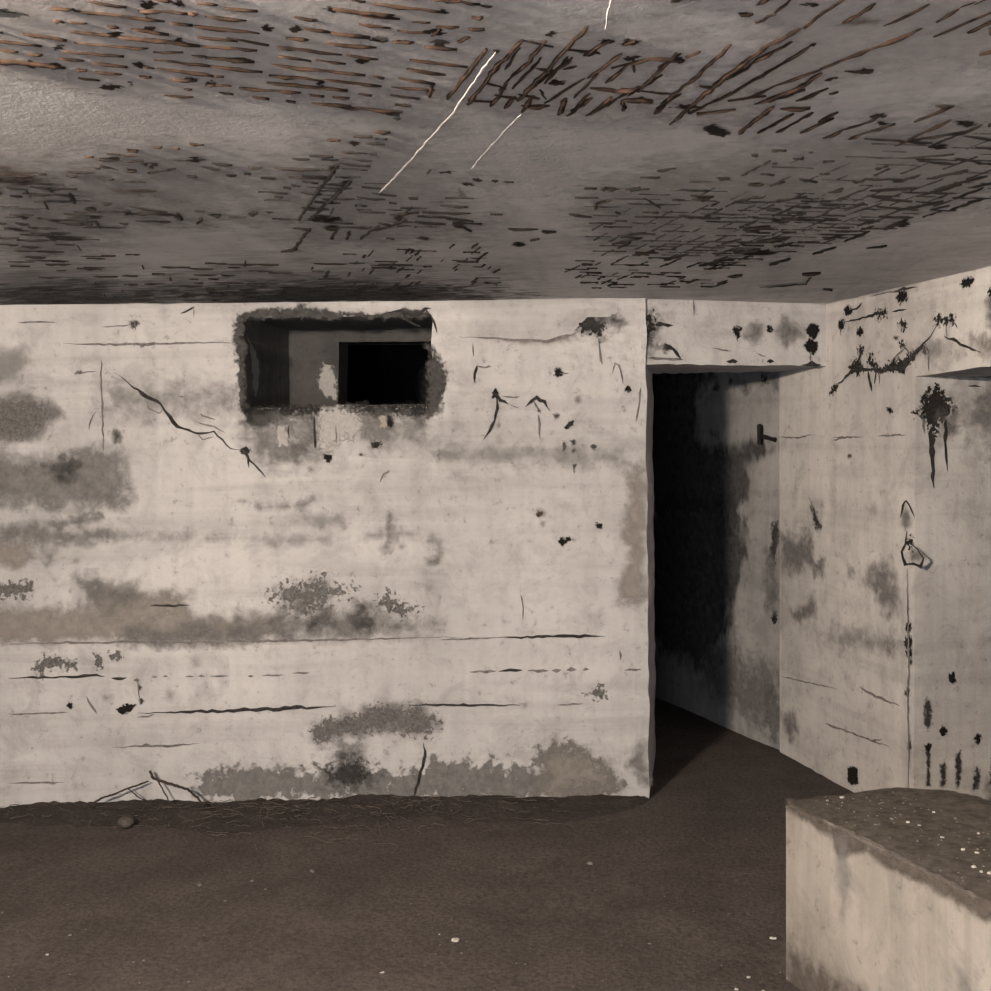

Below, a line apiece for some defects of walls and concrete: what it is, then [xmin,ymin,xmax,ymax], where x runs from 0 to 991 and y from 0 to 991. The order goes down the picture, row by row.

spalling [0,0,991,302]
crack [844,289,906,323]
crack [803,312,979,395]
crack [18,321,266,478]
spalling [276,363,363,453]
damp [0,447,130,569]
damp [620,372,797,743]
damp [0,580,289,646]
crack [11,672,334,718]
crack [112,741,199,749]
damp [190,738,628,801]
damp [629,745,650,784]